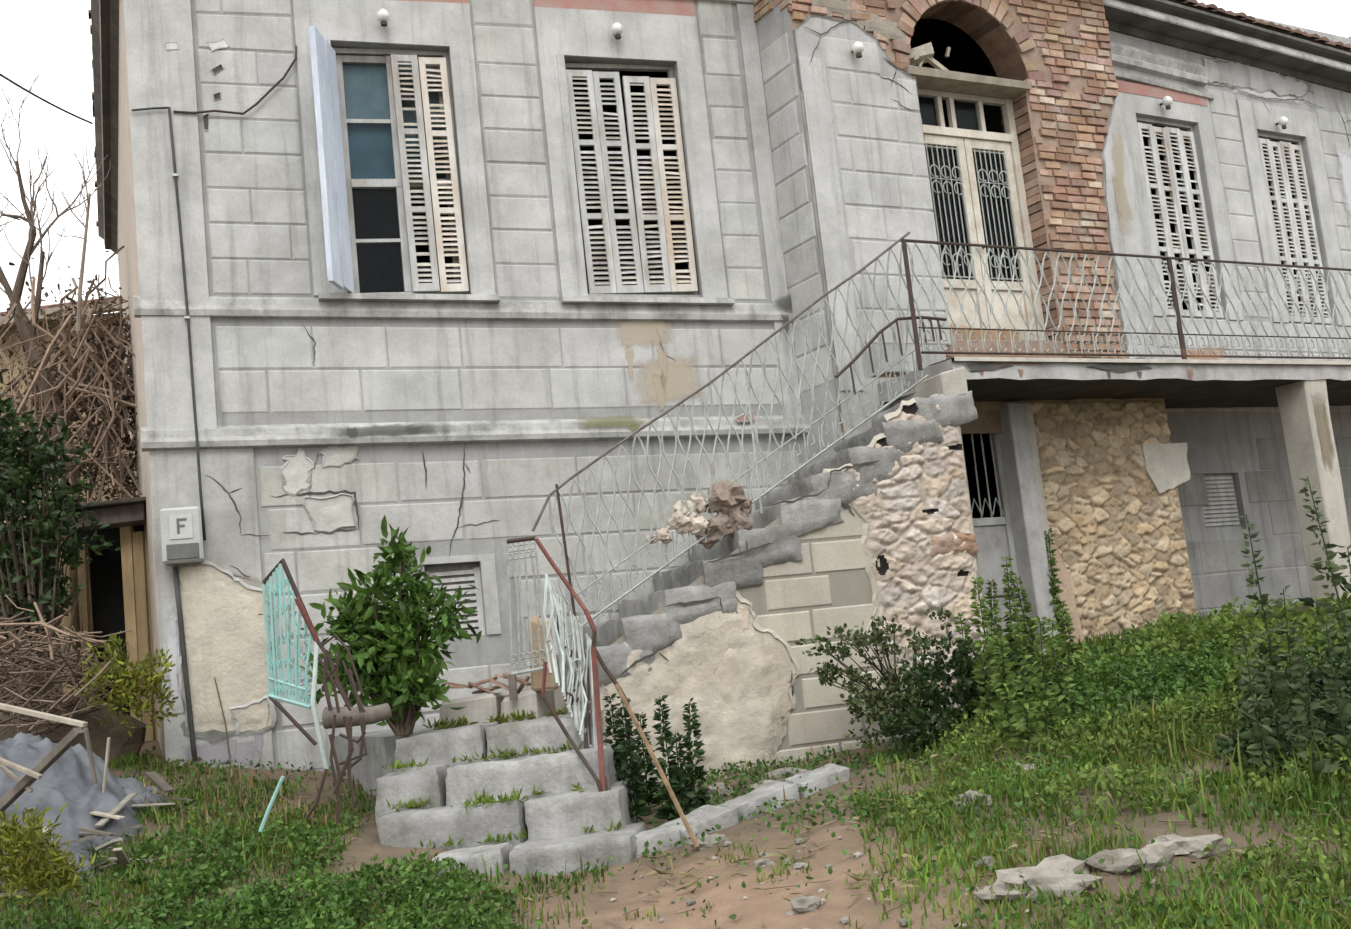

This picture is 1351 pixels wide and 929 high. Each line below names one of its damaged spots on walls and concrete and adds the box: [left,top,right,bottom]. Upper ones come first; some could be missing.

crack [805,20,852,65]
crack [875,57,918,113]
leakage [619,321,697,409]
leakage [583,417,643,431]
crack [206,453,359,536]
peeling [280,446,359,534]
crack [420,450,428,485]
crack [449,443,500,556]
peeling [1140,442,1190,494]
peeling [1050,534,1085,643]
peeling [175,559,277,744]